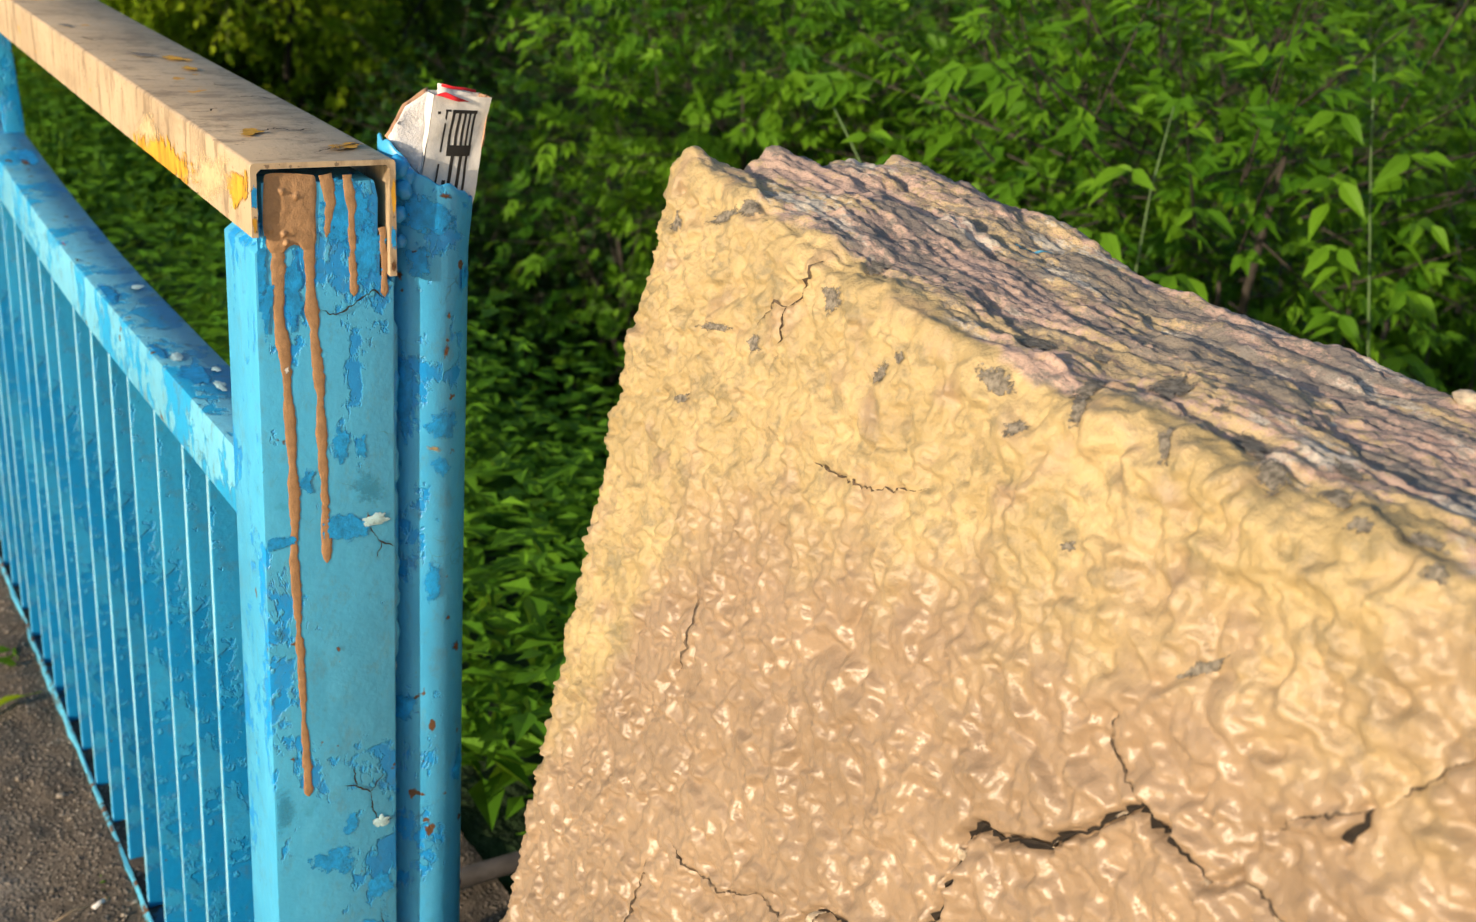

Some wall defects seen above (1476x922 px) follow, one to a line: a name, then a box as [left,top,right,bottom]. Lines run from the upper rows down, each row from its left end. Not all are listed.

peeling [133,114,304,342]
peeling [97,283,144,309]
peeling [148,342,228,391]
peeling [333,427,367,465]
peeling [267,536,297,552]
peeling [322,512,390,542]
peeling [424,563,441,601]
peeling [396,692,417,721]
crack [930,713,1280,922]
crack [1275,760,1476,845]
peeling [307,812,390,874]
crack [623,840,848,922]